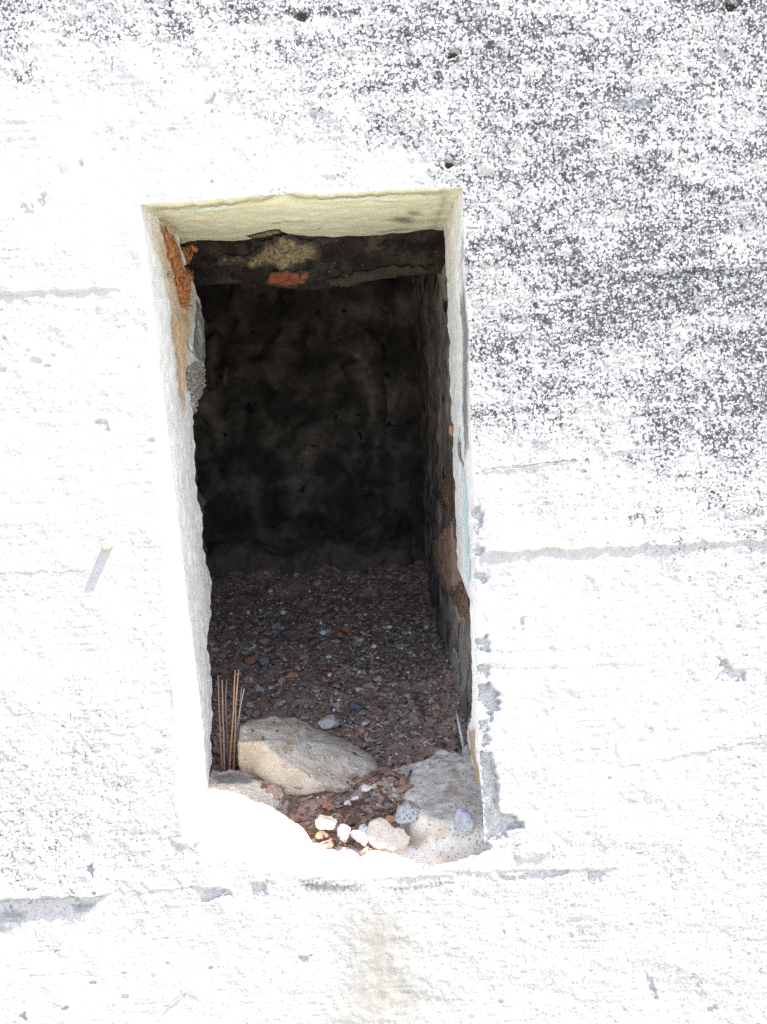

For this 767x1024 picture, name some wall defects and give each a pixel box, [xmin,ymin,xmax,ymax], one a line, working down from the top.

corrosion [159,220,193,409]
spalling [475,636,524,844]